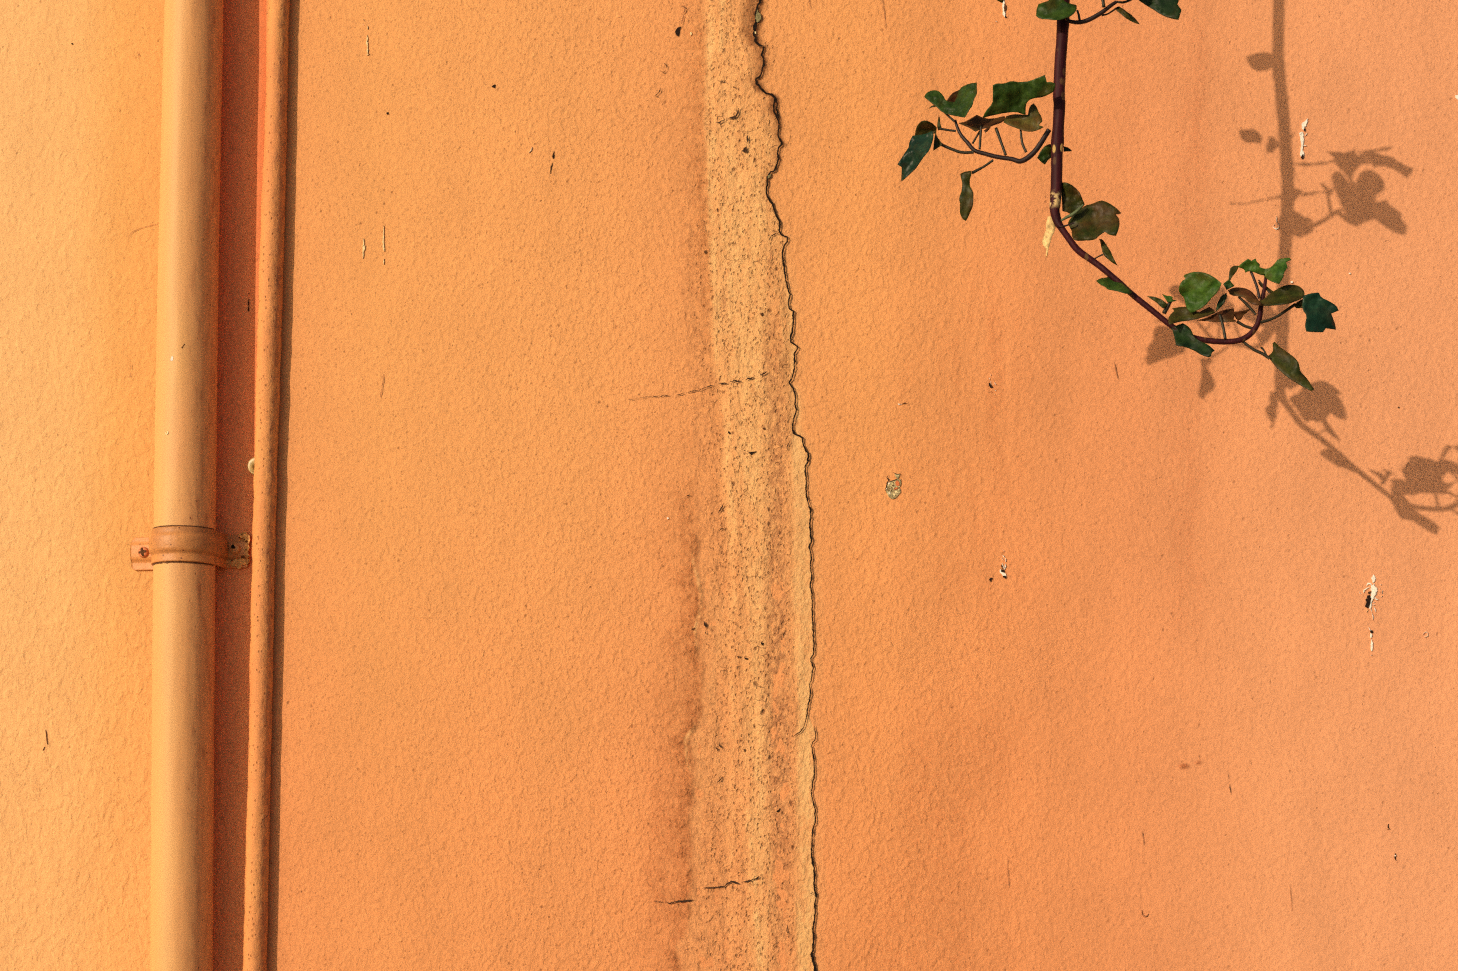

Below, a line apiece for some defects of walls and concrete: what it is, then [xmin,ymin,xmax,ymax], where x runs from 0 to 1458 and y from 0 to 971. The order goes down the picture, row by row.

peeling [1299,128,1307,159]
crack [629,0,817,971]
spalling [885,472,902,499]
peeling [1359,575,1383,656]